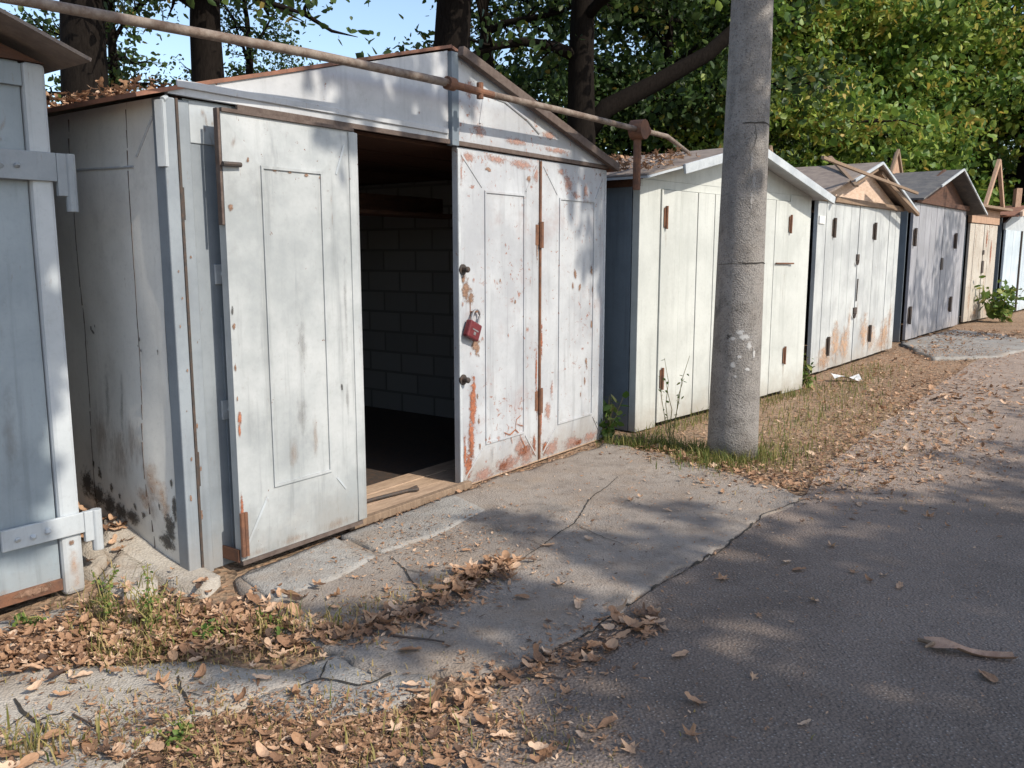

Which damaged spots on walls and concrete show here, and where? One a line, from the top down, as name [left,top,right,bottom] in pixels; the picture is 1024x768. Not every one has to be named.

peeling [486,156,538,181]
rust [860,315,891,346]
rust [464,376,596,483]
damp [82,461,145,525]
damp [158,479,177,550]
crack [525,476,624,557]
crack [532,499,805,662]